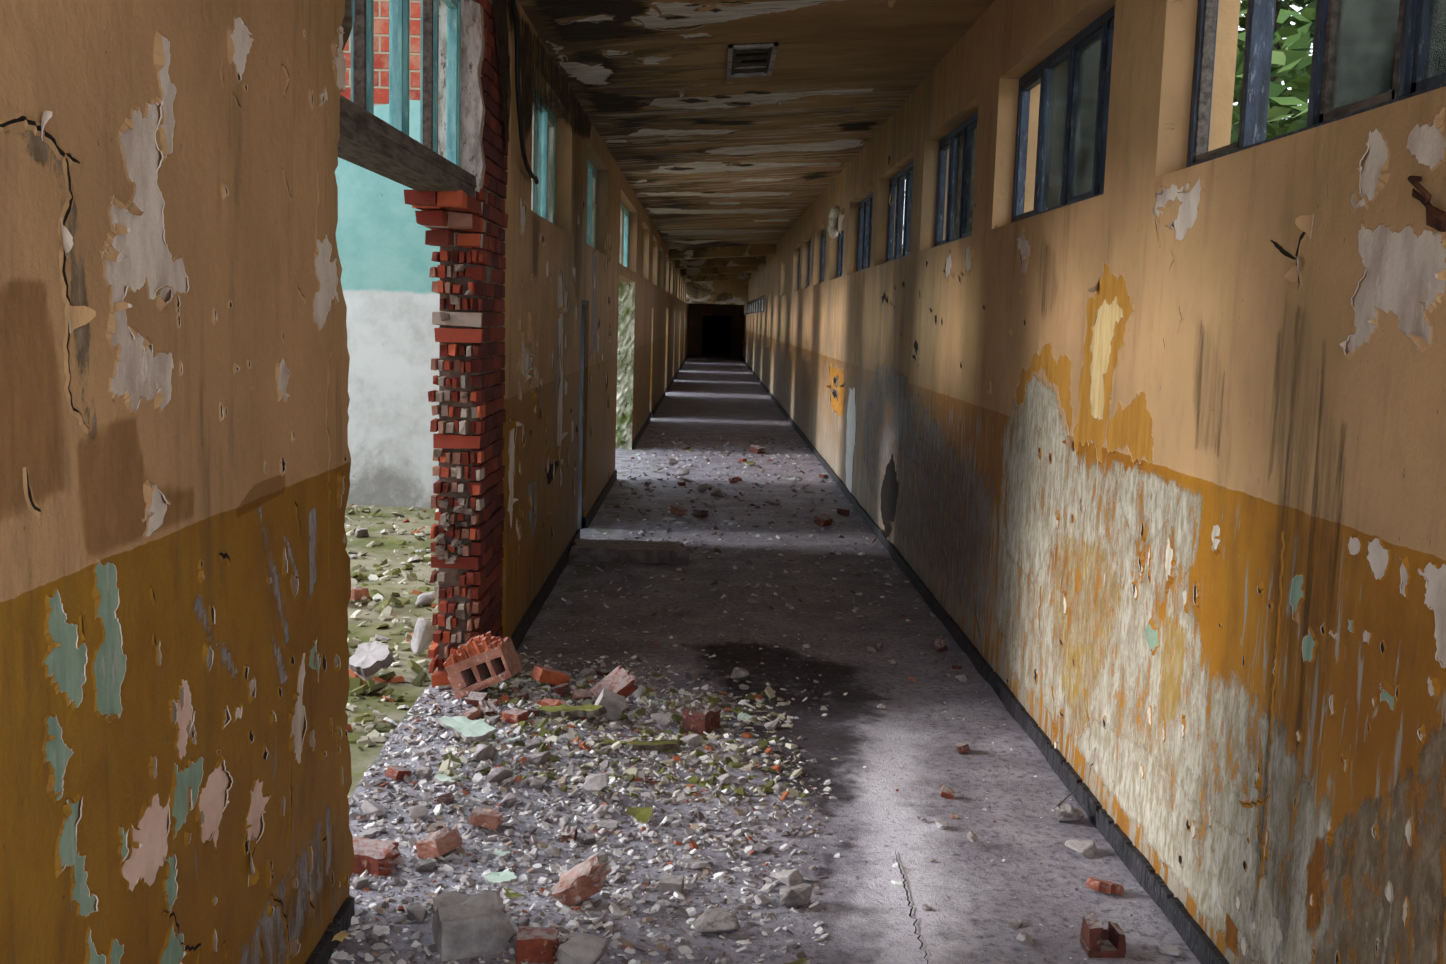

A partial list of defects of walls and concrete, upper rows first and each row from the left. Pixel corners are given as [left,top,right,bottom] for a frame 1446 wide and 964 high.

crack [0,111,96,434]
peeling [69,30,189,413]
spalling [404,189,485,248]
damp [492,0,669,159]
peeling [603,129,867,258]
damp [838,121,879,131]
peeling [1340,126,1446,361]
crack [22,466,42,519]
peeling [41,559,127,964]
peeling [118,677,233,964]
peeling [258,507,348,788]
peeling [995,260,1446,964]